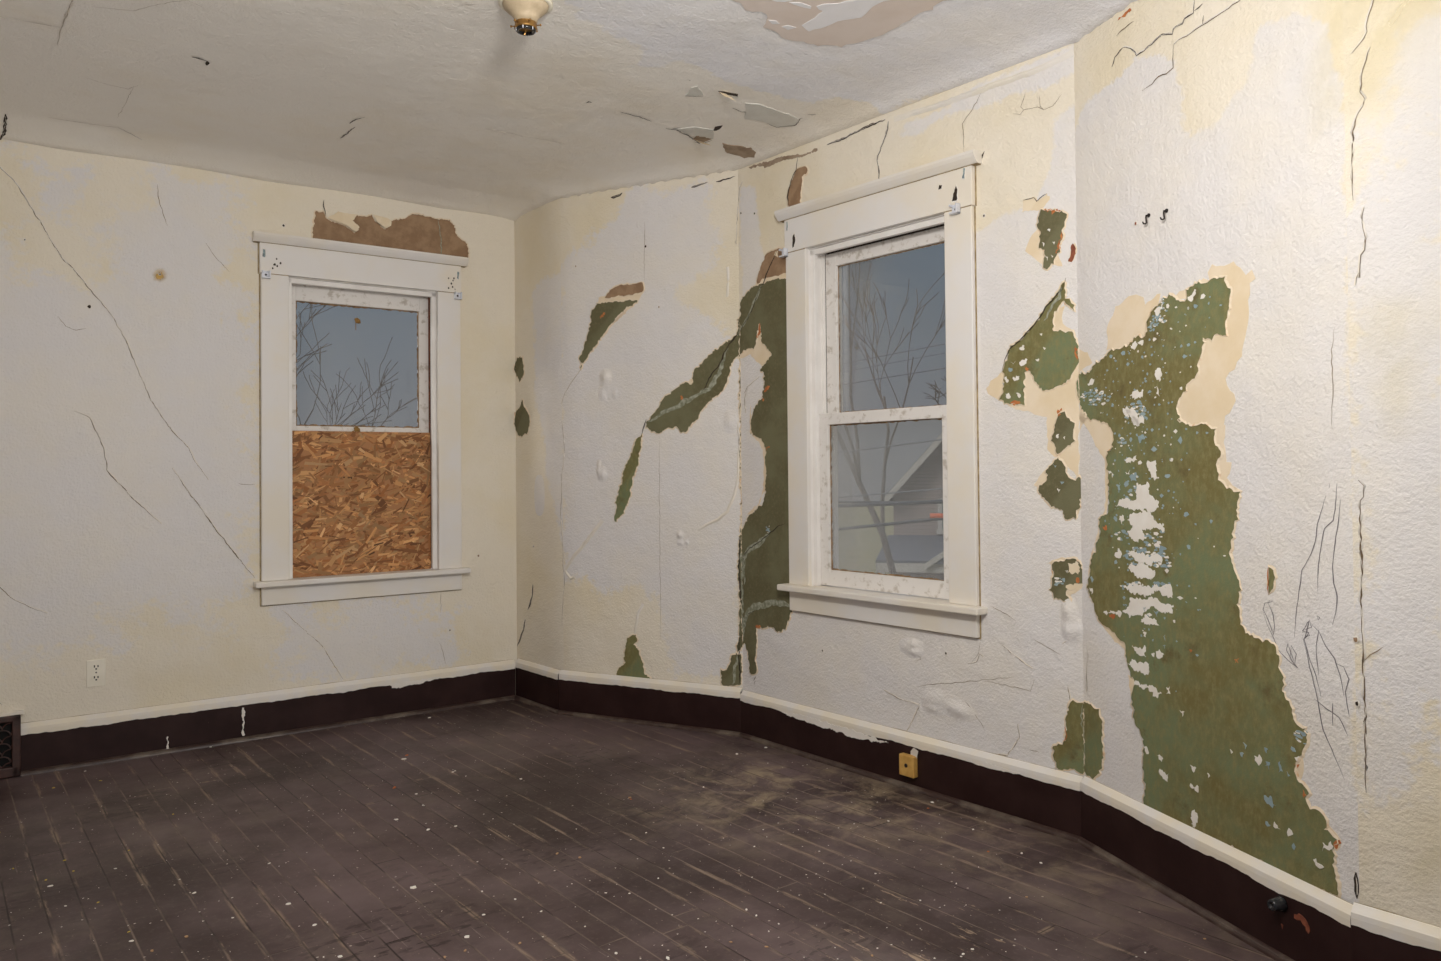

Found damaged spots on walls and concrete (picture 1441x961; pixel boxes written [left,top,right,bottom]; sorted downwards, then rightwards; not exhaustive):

peeling [733,0,944,47]
crack [1112,0,1240,91]
peeling [685,80,800,128]
crack [877,121,889,179]
crack [1350,0,1374,285]
peeling [311,201,470,280]
crack [0,114,255,578]
peeling [578,281,645,370]
peeling [614,125,818,687]
peeling [986,194,1342,898]